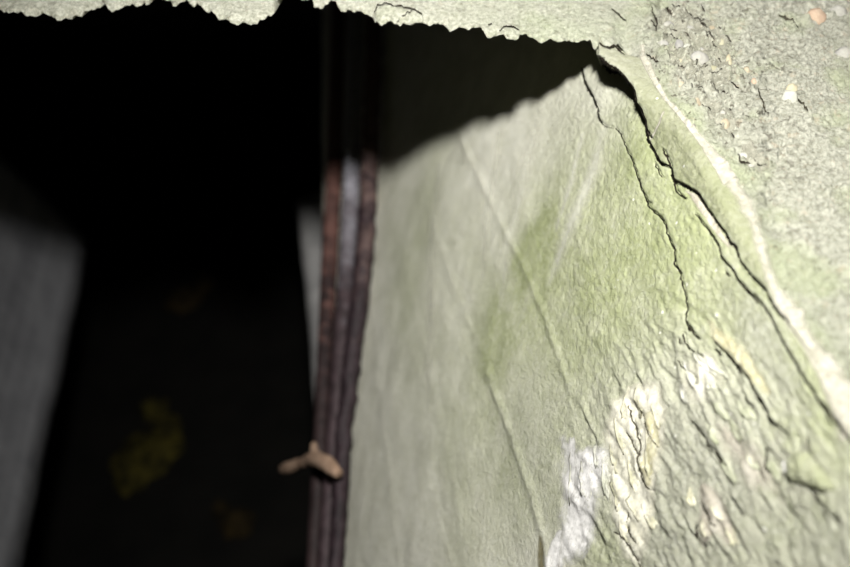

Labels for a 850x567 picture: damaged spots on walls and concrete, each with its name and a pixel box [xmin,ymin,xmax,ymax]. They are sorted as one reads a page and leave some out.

spalling [374,2,423,25]
spalling [499,25,519,40]
crack [581,43,850,468]
peeling [678,352,728,403]
peeling [736,398,757,420]
water stain [545,437,611,567]
peeling [605,384,665,564]
crack [626,405,659,490]
peeling [686,485,739,546]
peeling [704,403,793,509]
crack [758,448,770,480]
crack [810,488,841,529]